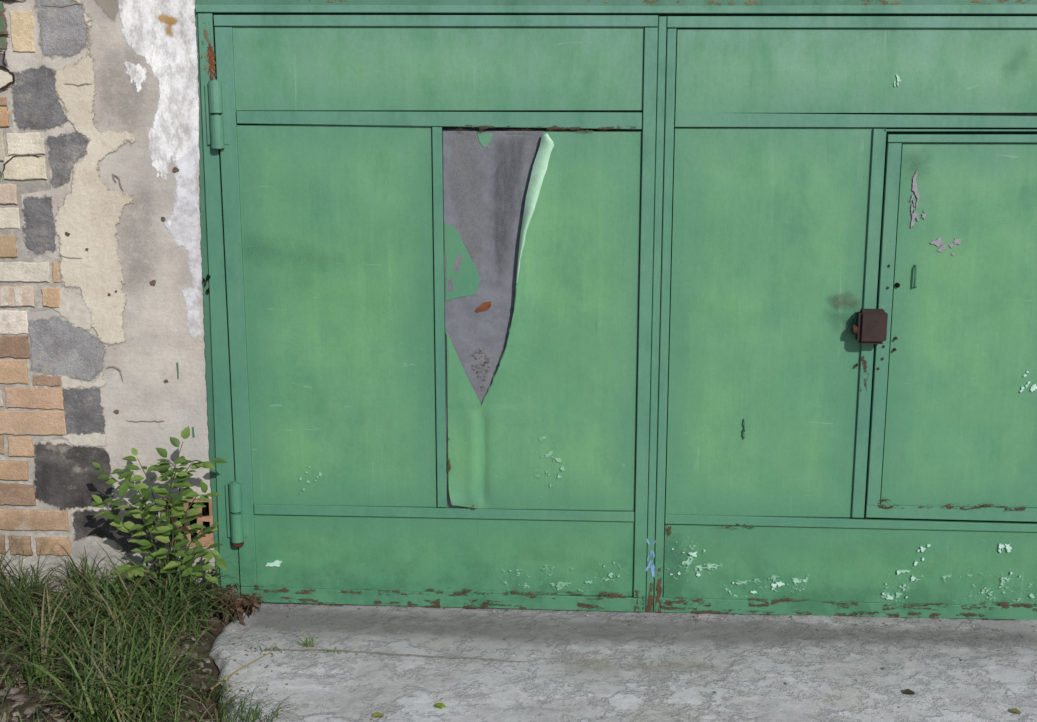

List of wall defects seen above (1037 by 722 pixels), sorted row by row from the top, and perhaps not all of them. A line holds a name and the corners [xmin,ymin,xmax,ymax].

rust [207,43,217,81]
flaking render [0,0,89,255]
peeling [119,0,211,337]
peeling [909,169,926,228]
peeling [930,237,961,256]
flaking render [28,316,161,552]
rust [254,568,812,615]
peeling [541,562,622,593]
peeling [646,539,656,578]
peeling [670,545,722,578]
peeling [725,575,808,598]
rust [821,601,1037,620]